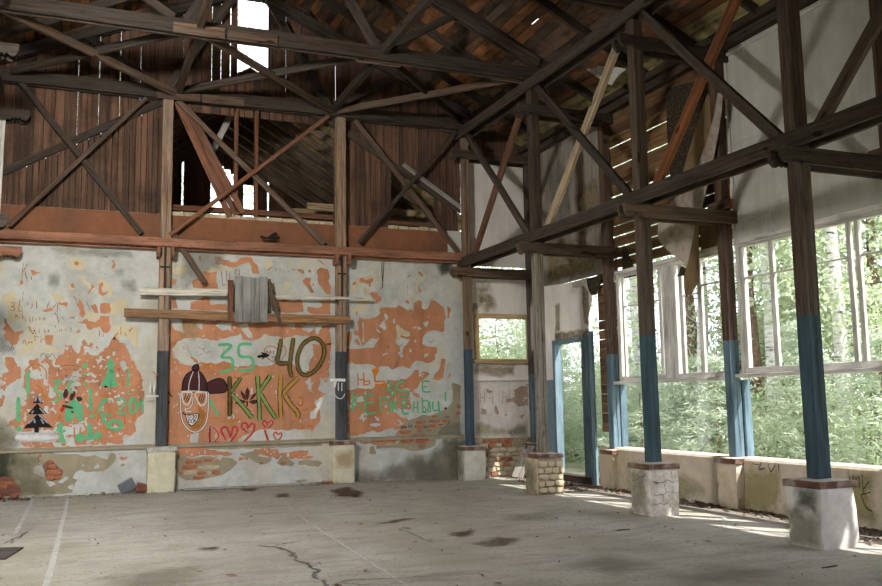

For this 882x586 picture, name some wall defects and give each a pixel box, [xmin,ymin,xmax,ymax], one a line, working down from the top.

peeling [0,256,145,496]
peeling [167,256,331,480]
peeling [347,271,461,454]
flaking render [475,437,530,478]
crack [259,540,449,586]